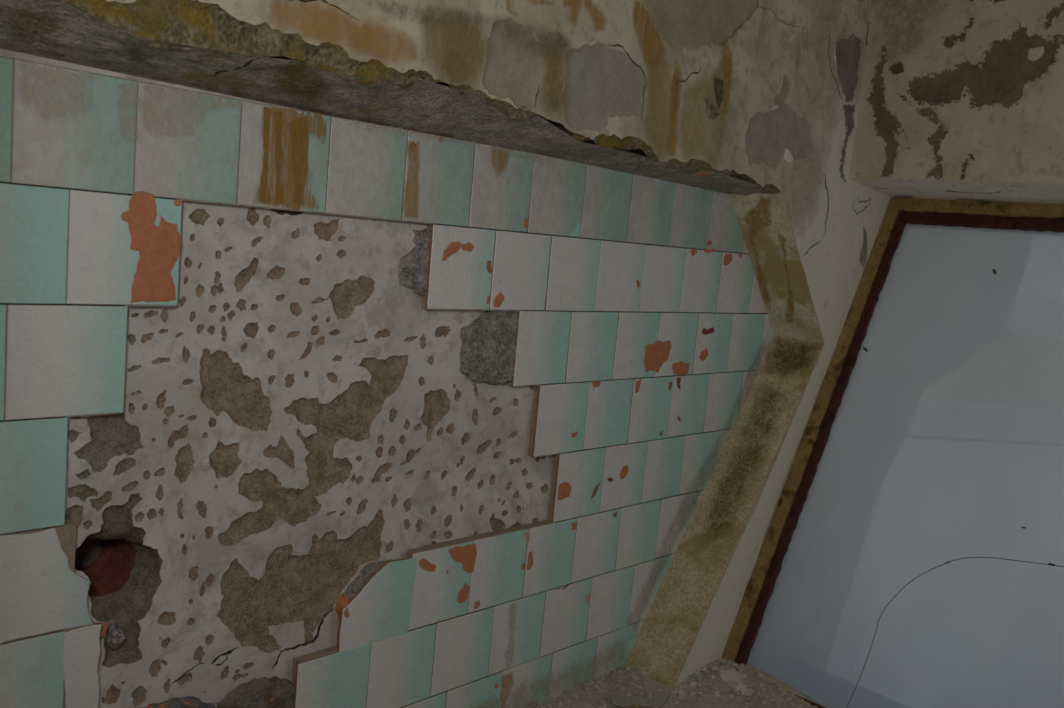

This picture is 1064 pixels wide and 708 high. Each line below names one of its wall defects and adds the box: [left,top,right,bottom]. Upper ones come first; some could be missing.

spalling [60,0,550,121]
crack [291,0,360,21]
corrosion [634,2,664,66]
flaking render [643,0,758,53]
corrosion [257,106,326,210]
flaking render [563,43,738,177]
corrosion [668,65,681,156]
flaking render [732,75,814,167]
peeling [635,340,708,393]
spalling [65,191,572,653]
leakage [710,389,780,531]
spalling [101,611,195,707]